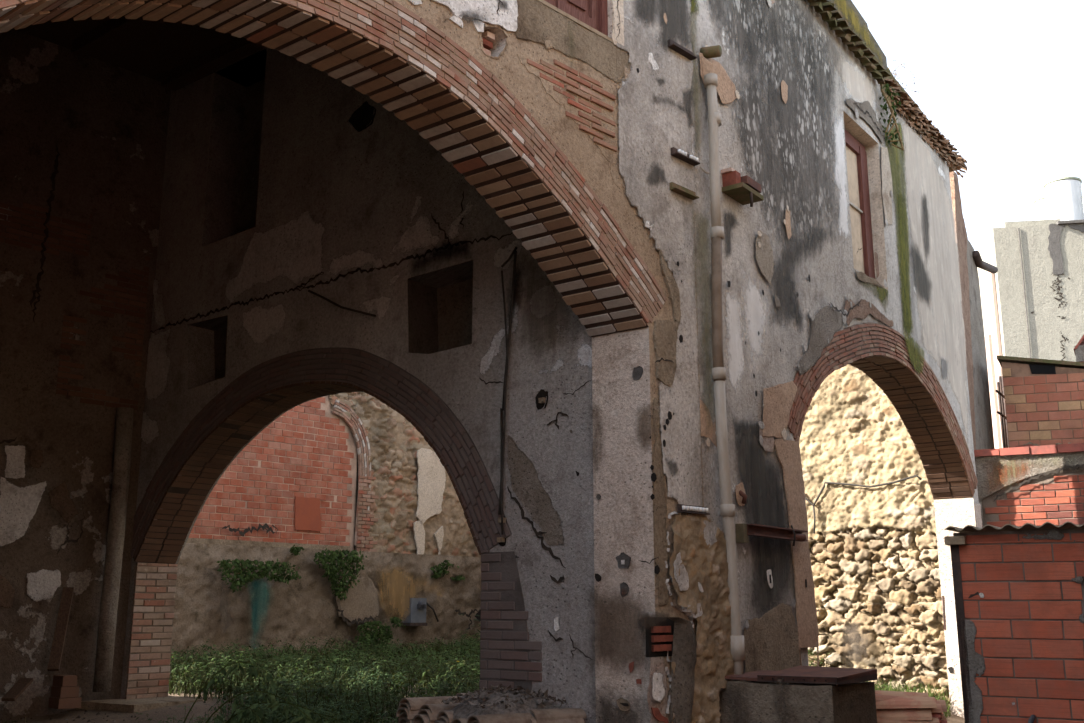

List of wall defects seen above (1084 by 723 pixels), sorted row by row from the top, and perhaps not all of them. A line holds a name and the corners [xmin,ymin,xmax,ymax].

water stain [636,0,699,128]
water stain [648,165,665,184]
water stain [709,0,838,322]
crack [150,191,513,333]
water stain [898,195,931,328]
flaking render [408,0,800,723]
flaking render [755,294,893,452]
flaking render [0,445,47,546]
flaking render [27,569,61,602]
flaking render [294,496,322,531]
crack [507,487,566,584]